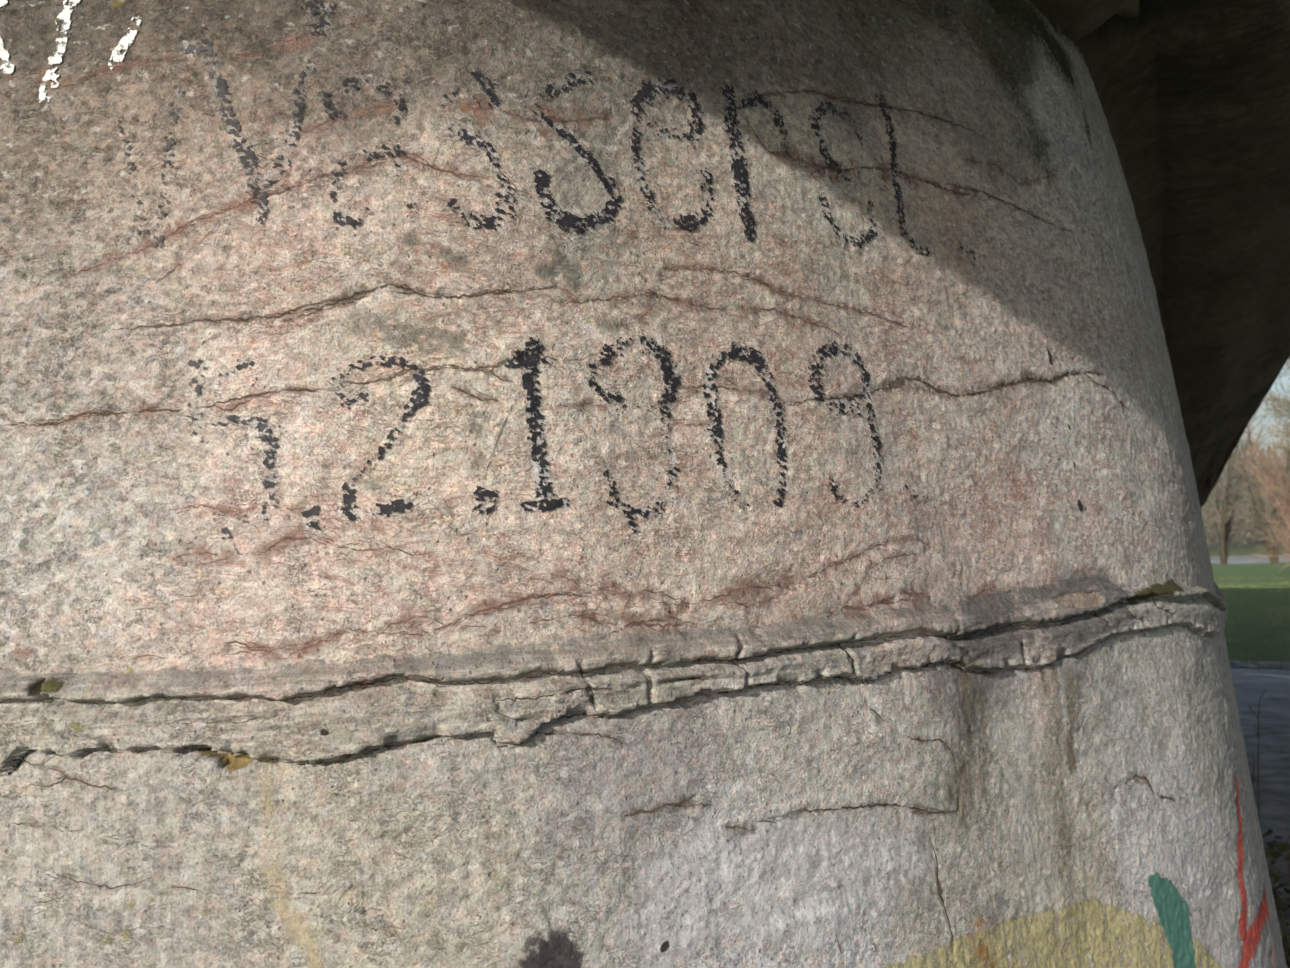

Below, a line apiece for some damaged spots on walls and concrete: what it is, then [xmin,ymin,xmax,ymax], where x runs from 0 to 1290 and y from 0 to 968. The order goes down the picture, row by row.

crack [761,90,1069,231]
crack [112,284,556,330]
crack [5,354,583,431]
crack [556,400,605,409]
crack [790,370,1135,414]
crack [303,537,928,652]
crack [1094,599,1172,623]
crack [498,639,748,744]
crack [838,637,894,718]
crack [910,737,957,765]